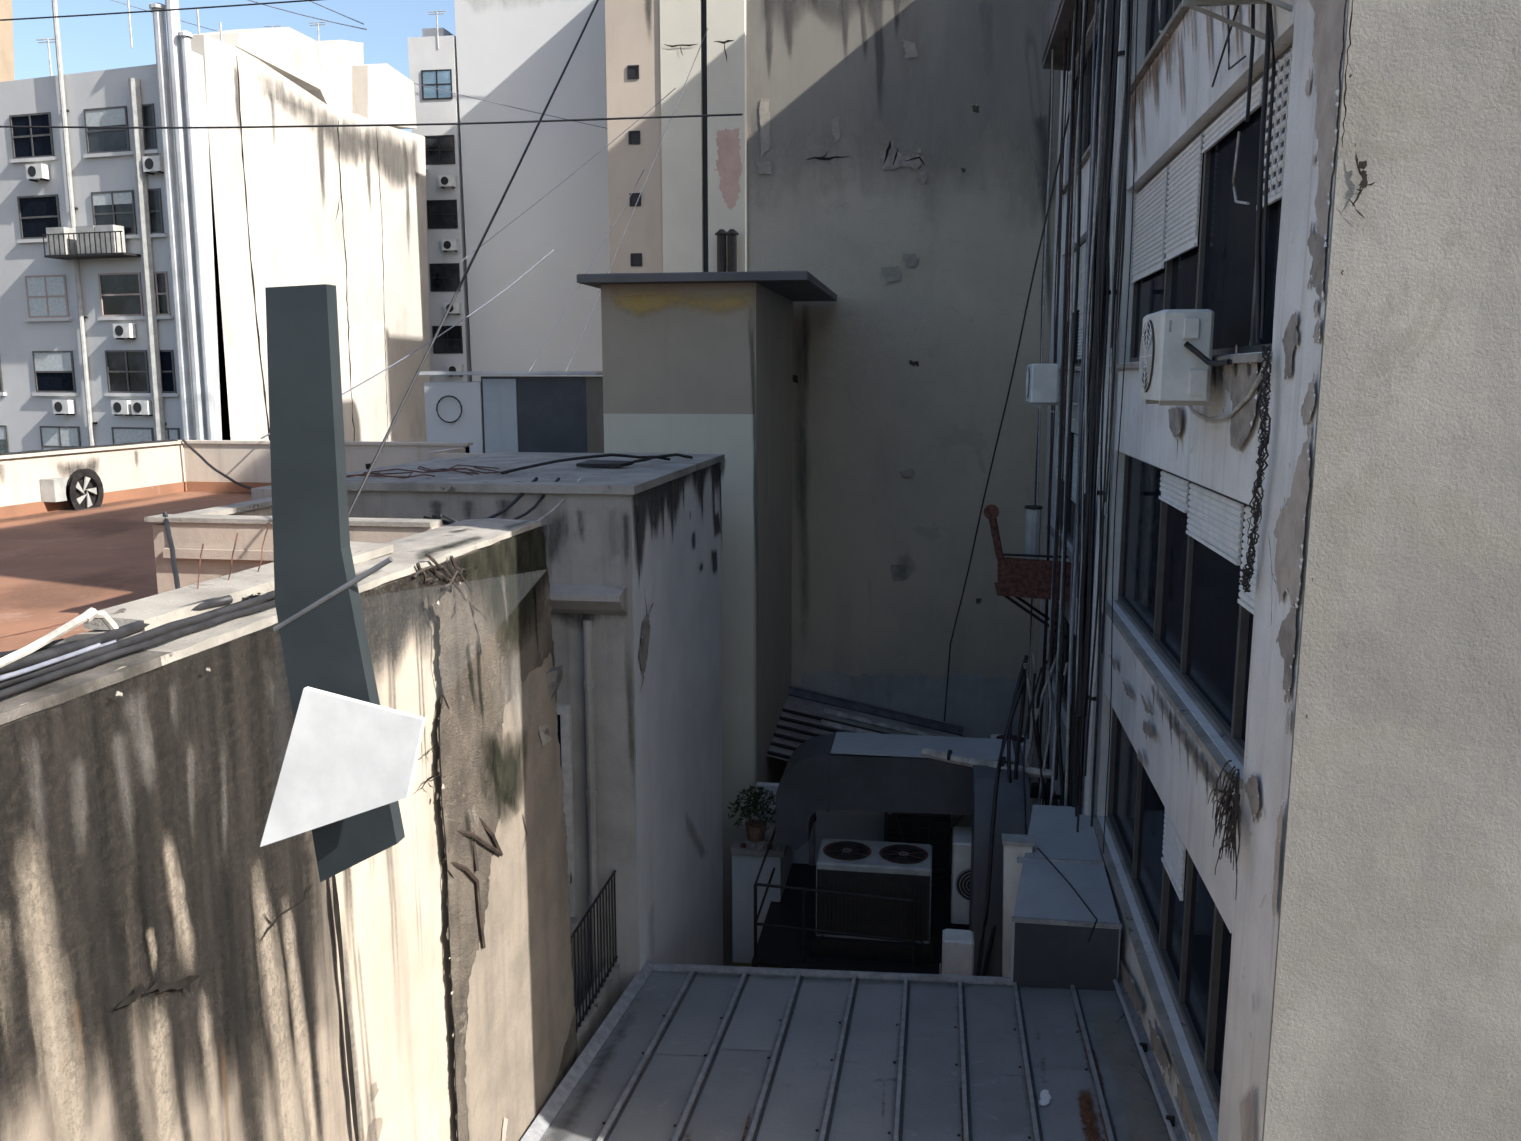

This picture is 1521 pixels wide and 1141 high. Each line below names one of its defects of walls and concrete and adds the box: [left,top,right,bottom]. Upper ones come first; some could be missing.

leakage [269,91,416,225]
peeling [714,127,742,210]
spalling [759,98,771,157]
leakage [747,0,1078,297]
peeling [1282,0,1368,380]
leakage [624,460,725,576]
peeling [1274,373,1315,703]
leakage [359,514,582,757]
leakage [485,739,527,843]
leakage [0,623,324,1141]
peeling [1272,799,1284,922]
rust [1077,1016,1115,1141]